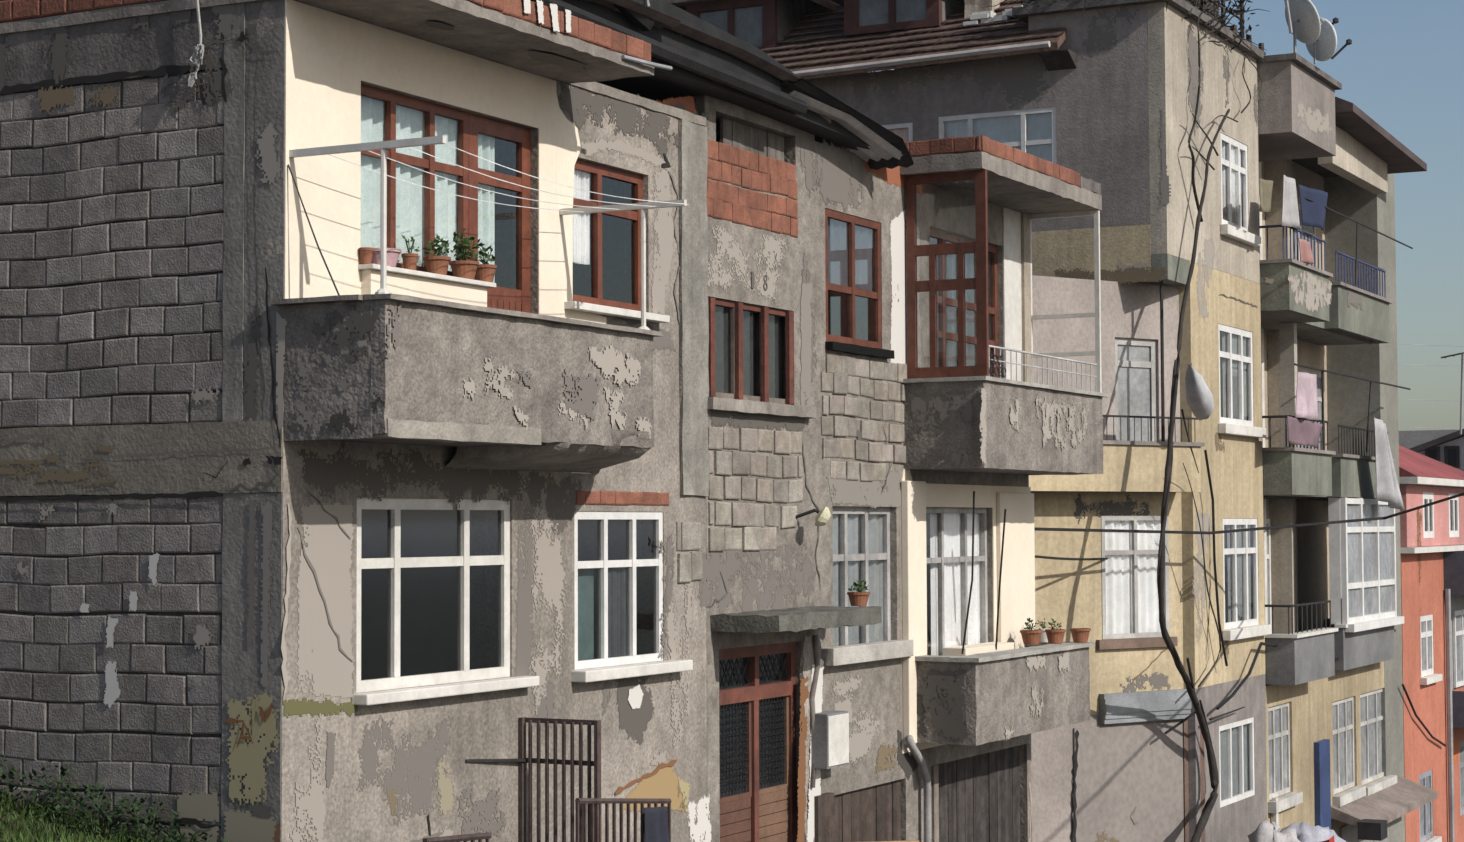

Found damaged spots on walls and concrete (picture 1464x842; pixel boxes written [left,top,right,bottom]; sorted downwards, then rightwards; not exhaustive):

flaking render [707,139,798,238]
crack [0,31,353,699]
spalling [623,762,711,842]